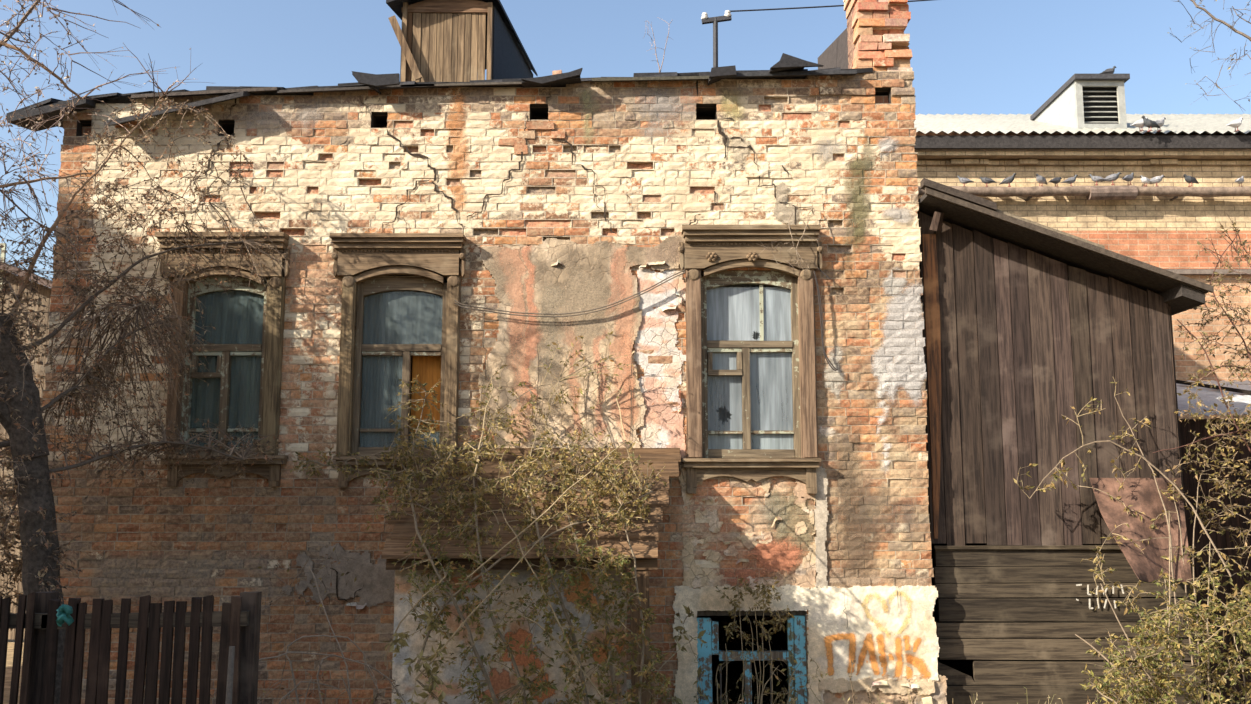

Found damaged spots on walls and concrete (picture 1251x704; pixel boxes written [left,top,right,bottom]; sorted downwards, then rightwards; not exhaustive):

crack [360,85,630,234]
leakage [643,92,694,135]
crack [717,118,815,225]
leakage [845,143,872,259]
peeling [632,261,817,590]
leakage [875,362,896,465]
leakage [815,429,928,588]